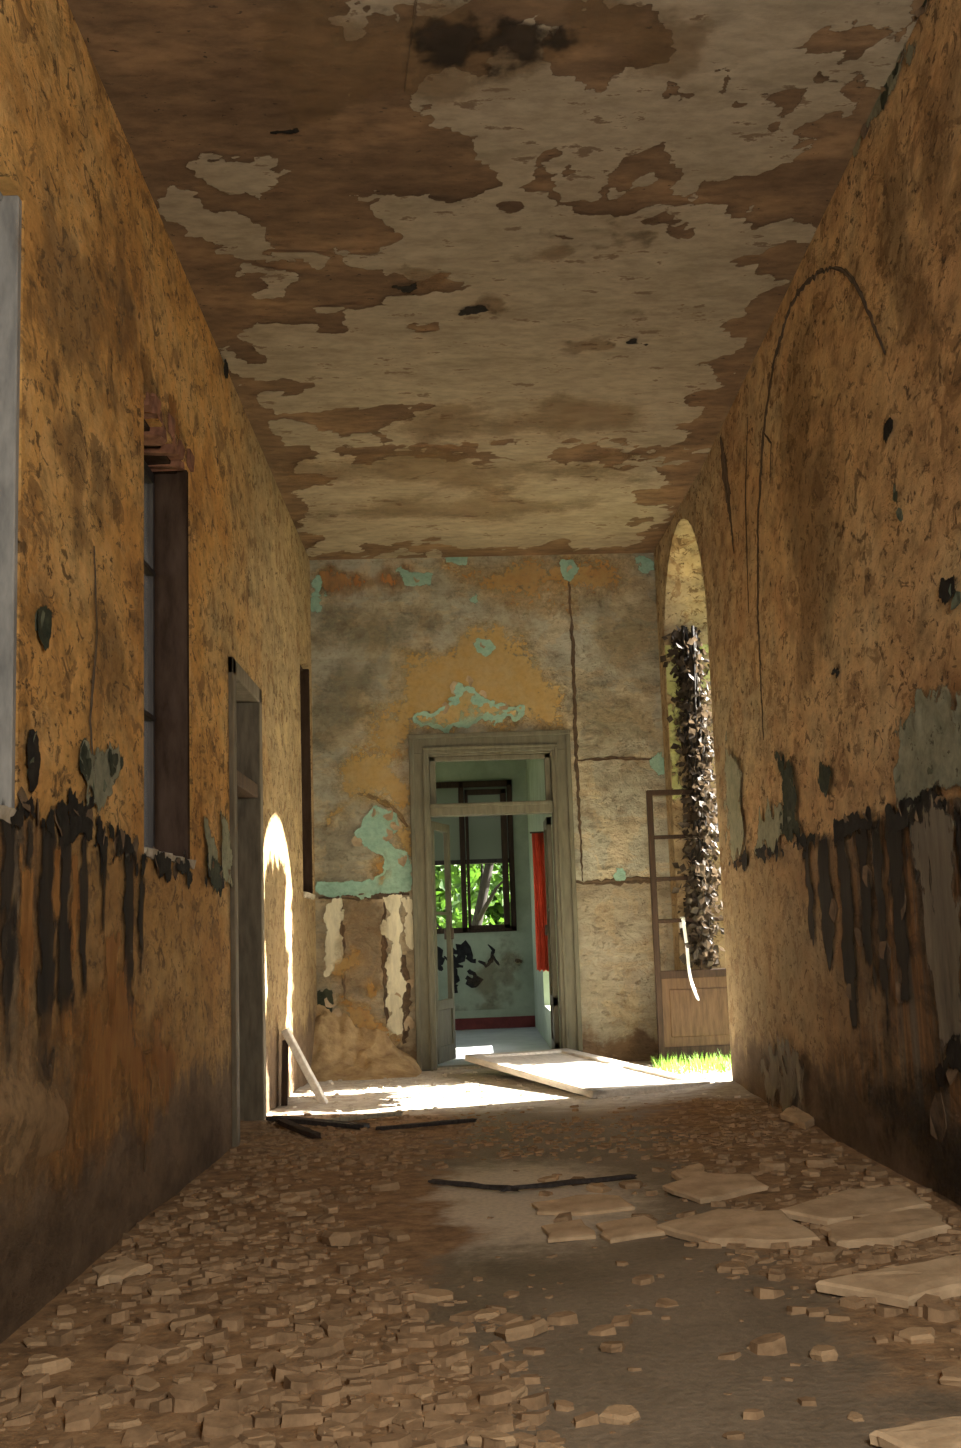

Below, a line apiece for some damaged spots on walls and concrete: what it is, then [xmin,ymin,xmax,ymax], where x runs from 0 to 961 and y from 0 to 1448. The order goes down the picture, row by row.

peeling [157,0,929,586]
spalling [144,381,195,472]
crack [720,266,886,740]
peeling [311,575,327,613]
peeling [939,575,961,610]
leakage [0,801,107,1089]
spalling [10,729,233,897]
leakage [123,856,145,1014]
peeling [315,623,565,1044]
peeling [613,868,626,881]
peeling [649,752,665,778]
peeling [724,684,961,1052]